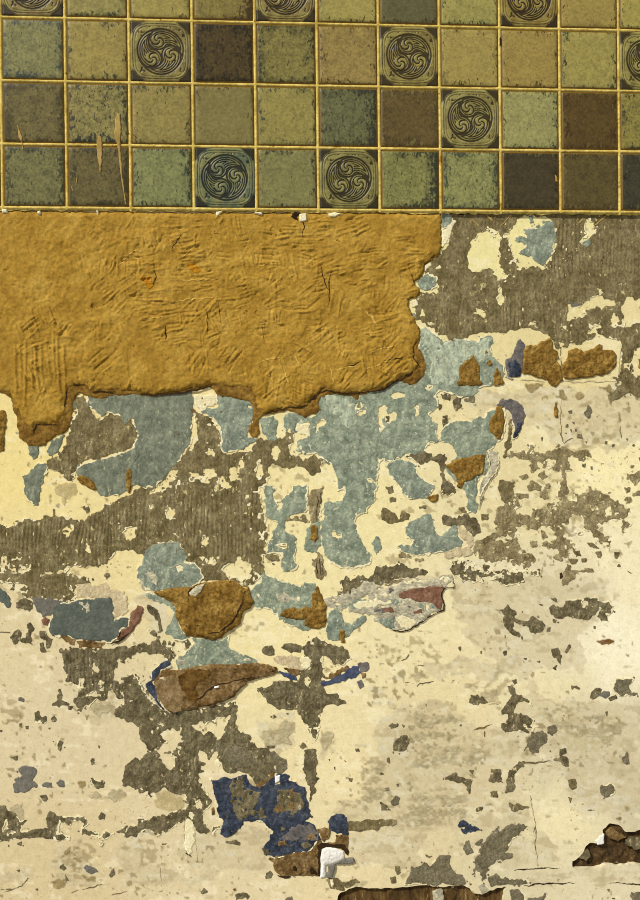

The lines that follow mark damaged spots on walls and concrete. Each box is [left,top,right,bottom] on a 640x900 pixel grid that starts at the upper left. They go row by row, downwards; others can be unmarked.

spalling [0,212,640,859]
spalling [390,820,546,900]